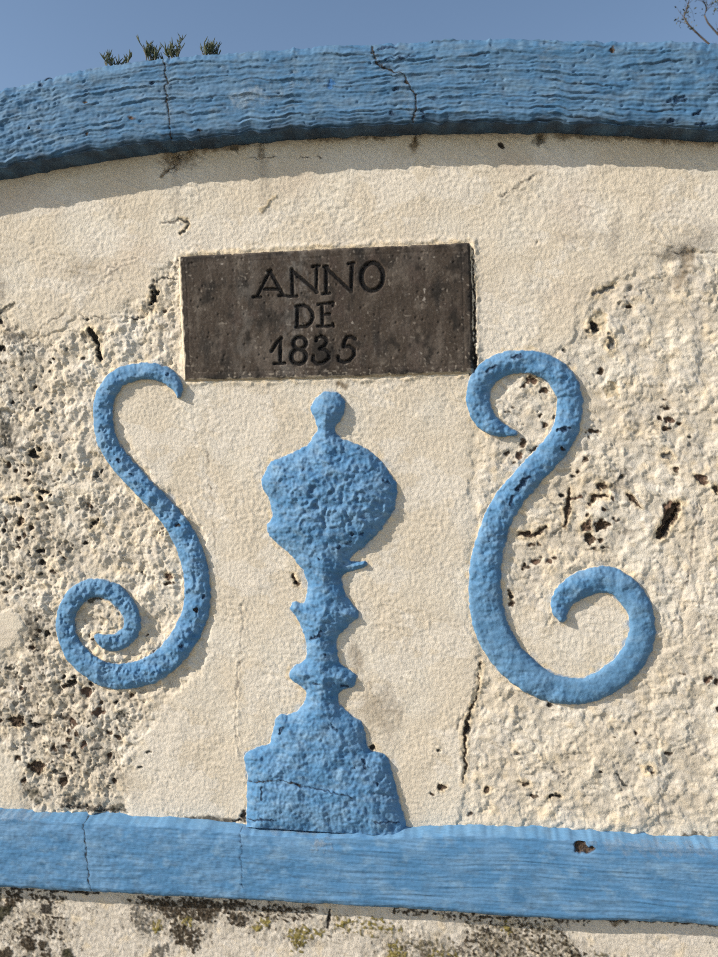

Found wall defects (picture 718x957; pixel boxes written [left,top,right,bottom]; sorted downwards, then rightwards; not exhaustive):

crack [371,46,426,122]
crack [163,62,179,172]
spalling [81,318,103,361]
damp [0,420,19,452]
spalling [694,475,718,495]
spalling [581,473,630,550]
spalling [656,500,681,539]
spalling [518,526,557,570]
crack [457,662,481,783]
mould [60,796,126,813]
crack [239,780,353,859]
damp [4,887,99,895]